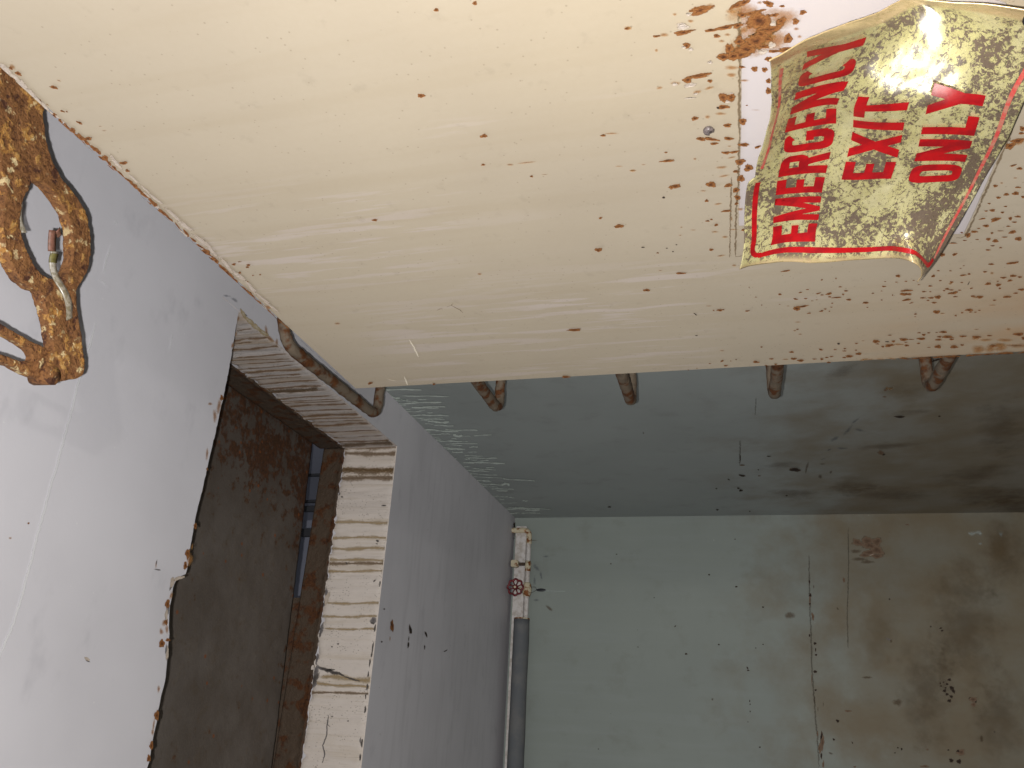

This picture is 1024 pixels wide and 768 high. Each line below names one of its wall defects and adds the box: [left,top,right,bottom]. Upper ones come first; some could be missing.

corrosion [10,73,308,347]
corrosion [653,0,807,237]
corrosion [873,329,1024,359]
corrosion [159,593,172,647]